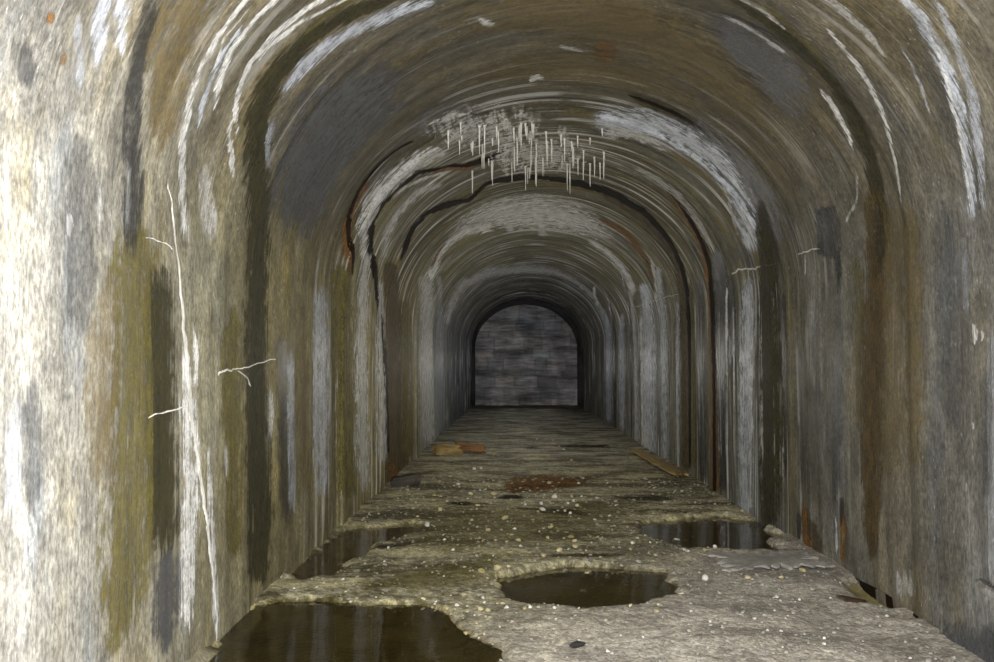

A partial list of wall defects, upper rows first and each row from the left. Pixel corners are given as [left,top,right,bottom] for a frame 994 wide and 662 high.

leakage [19,46,36,85]
leakage [270,1,433,238]
leakage [901,0,984,217]
leakage [267,102,588,520]
crack [341,141,772,492]
corrosion [796,504,822,553]
corrosion [835,498,846,562]